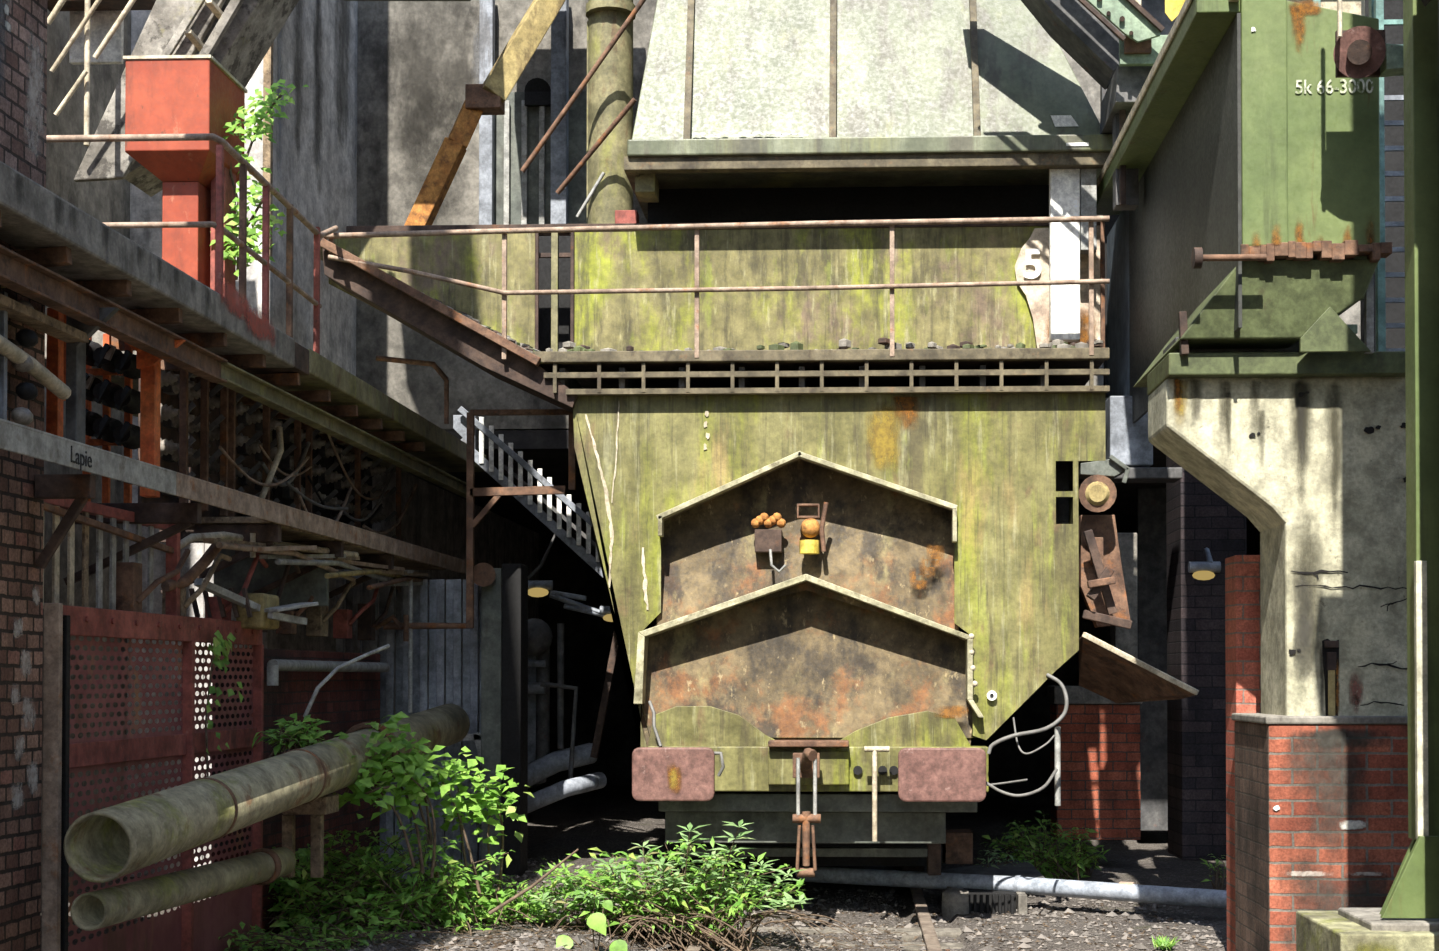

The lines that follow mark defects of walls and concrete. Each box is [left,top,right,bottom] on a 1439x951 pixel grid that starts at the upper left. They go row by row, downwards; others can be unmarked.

rust [1290,1,1320,44]
rust [1253,225,1303,245]
water stain [1221,385,1230,435]
water stain [1252,381,1264,440]
water stain [1293,382,1309,450]
water stain [1330,385,1339,487]
rust [910,546,943,589]
water stain [1295,530,1316,667]
crack [1291,569,1407,611]
crack [1358,661,1407,670]
crack [1360,699,1404,707]
rust [668,767,681,791]